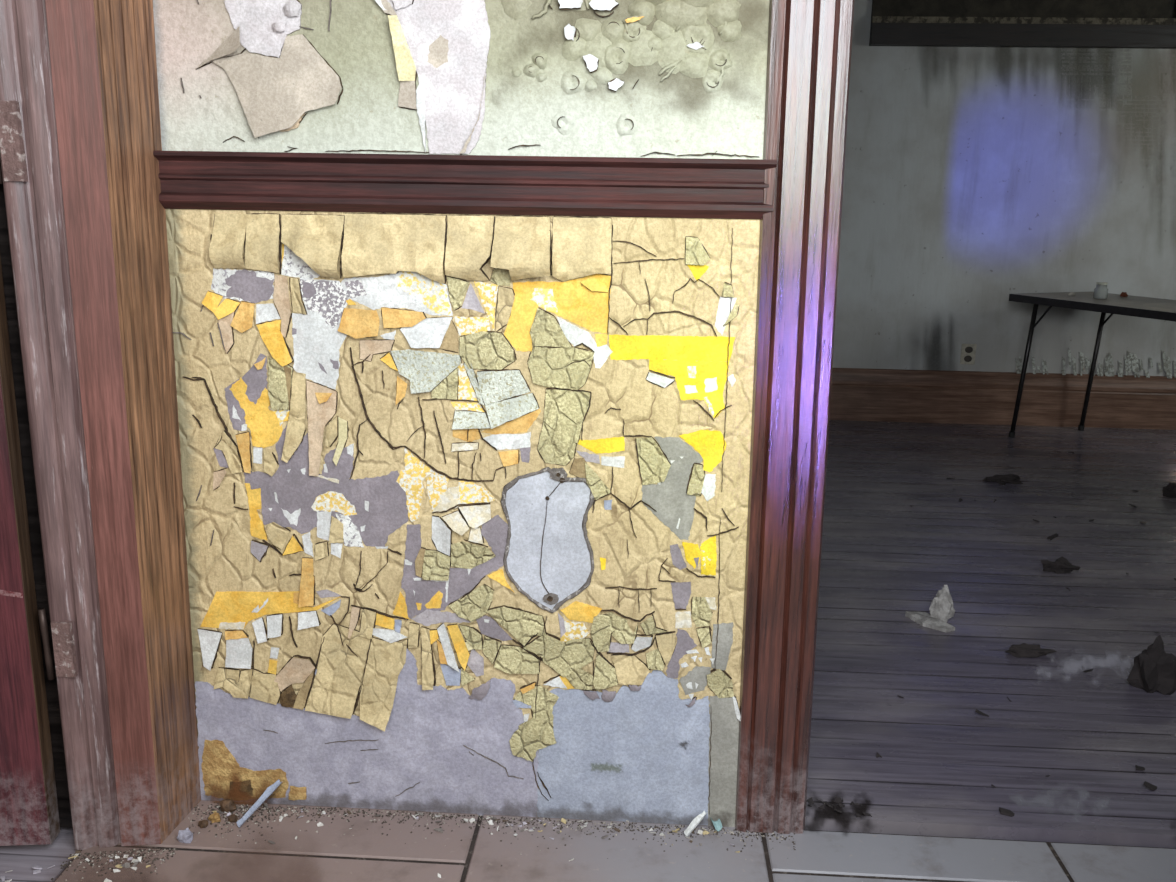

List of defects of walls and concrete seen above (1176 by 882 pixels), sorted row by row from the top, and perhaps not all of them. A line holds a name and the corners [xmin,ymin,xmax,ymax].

peeling [196,0,343,138]
peeling [375,0,491,155]
crack [338,216,346,278]
crack [442,215,450,251]
crack [480,216,495,269]
peeling [1015,348,1176,378]
crack [350,347,506,531]
crack [539,225,739,677]
flaking render [195,213,741,846]
crack [495,617,561,718]
crack [706,721,714,814]